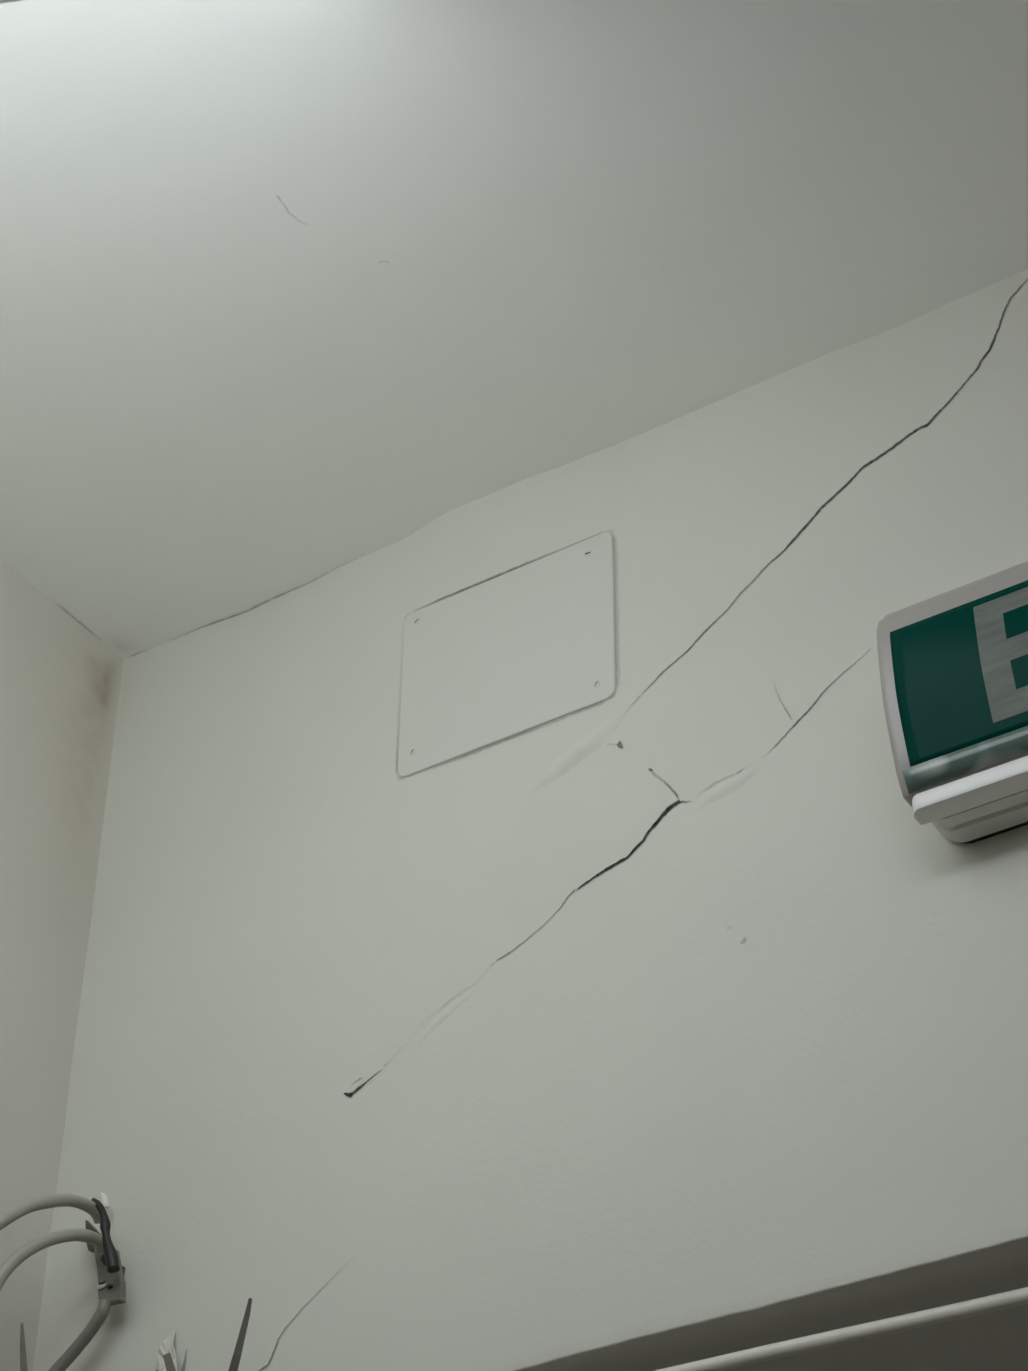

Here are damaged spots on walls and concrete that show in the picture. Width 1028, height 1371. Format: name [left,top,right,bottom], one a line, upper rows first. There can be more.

crack [767,286,1021,566]
crack [658,621,716,676]
crack [775,672,844,746]
crack [572,800,682,892]
crack [343,1070,384,1098]